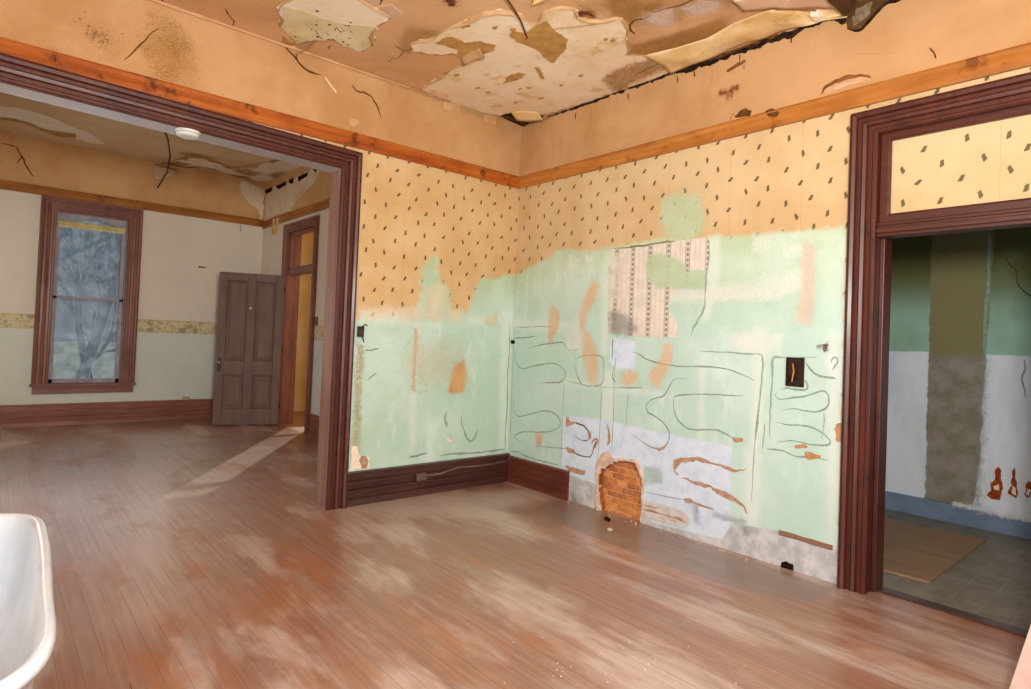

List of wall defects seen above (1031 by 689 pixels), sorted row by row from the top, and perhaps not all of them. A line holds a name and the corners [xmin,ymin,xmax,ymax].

crack [124,28,159,61]
leakage [133,6,205,90]
crack [285,47,381,117]
flaking render [276,0,391,52]
flaking render [410,0,667,126]
flaking render [733,0,901,32]
crack [0,142,33,176]
flaking render [161,152,320,235]
crack [983,232,1031,371]
peeling [349,446,370,471]
flaking render [565,424,645,522]
flaking render [673,457,747,514]